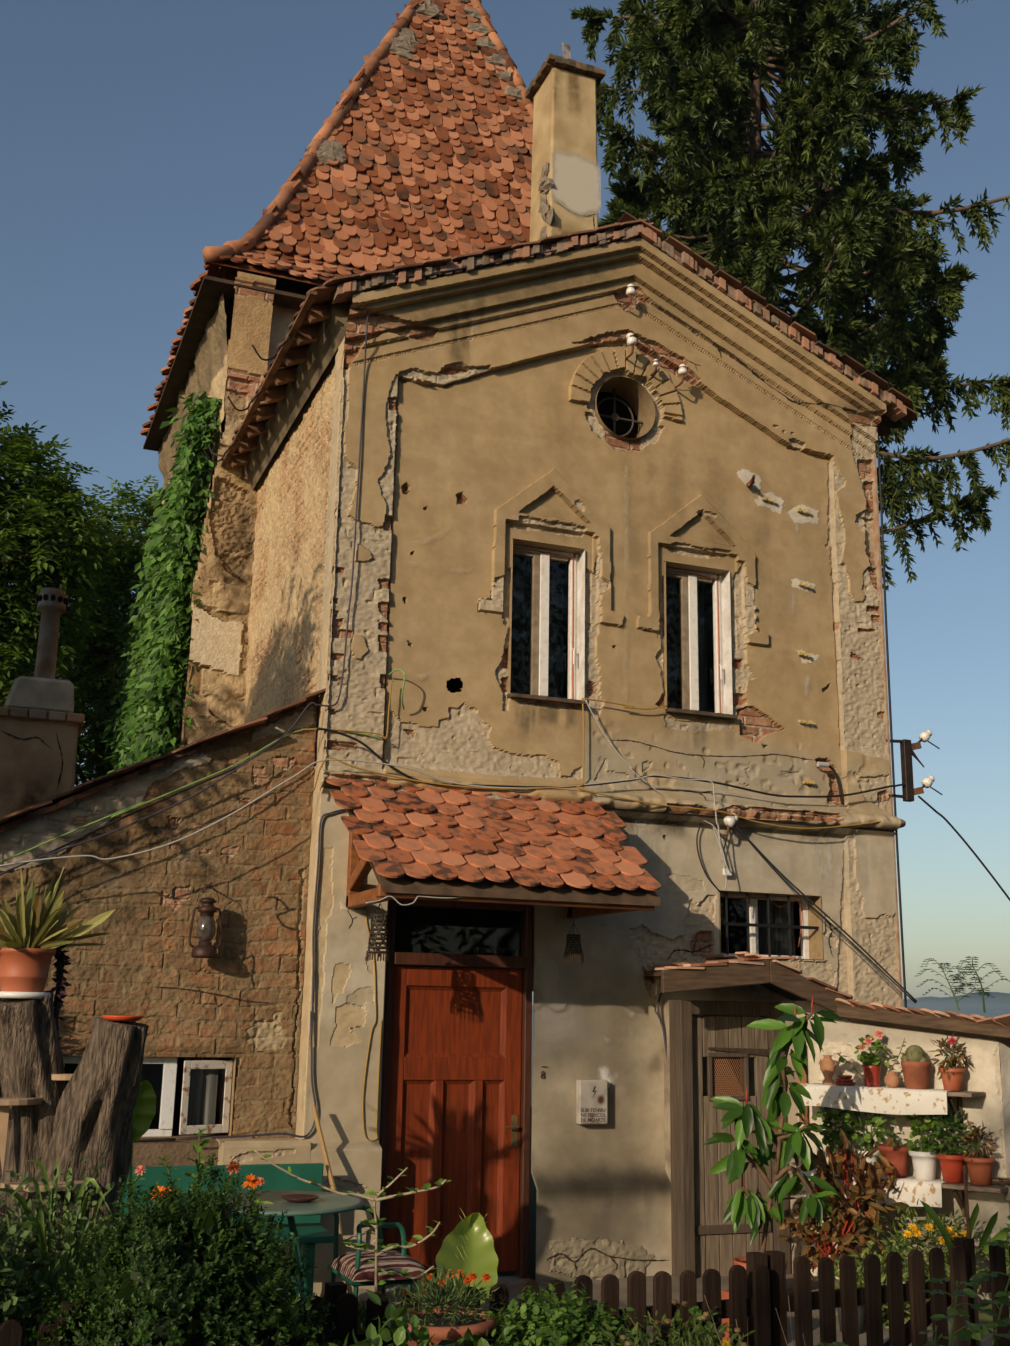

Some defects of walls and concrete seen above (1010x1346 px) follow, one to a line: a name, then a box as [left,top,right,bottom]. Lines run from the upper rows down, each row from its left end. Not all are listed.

spalling [209,476,254,577]
spalling [232,302,665,1161]
spalling [629,873,717,1014]
spalling [655,407,900,1007]